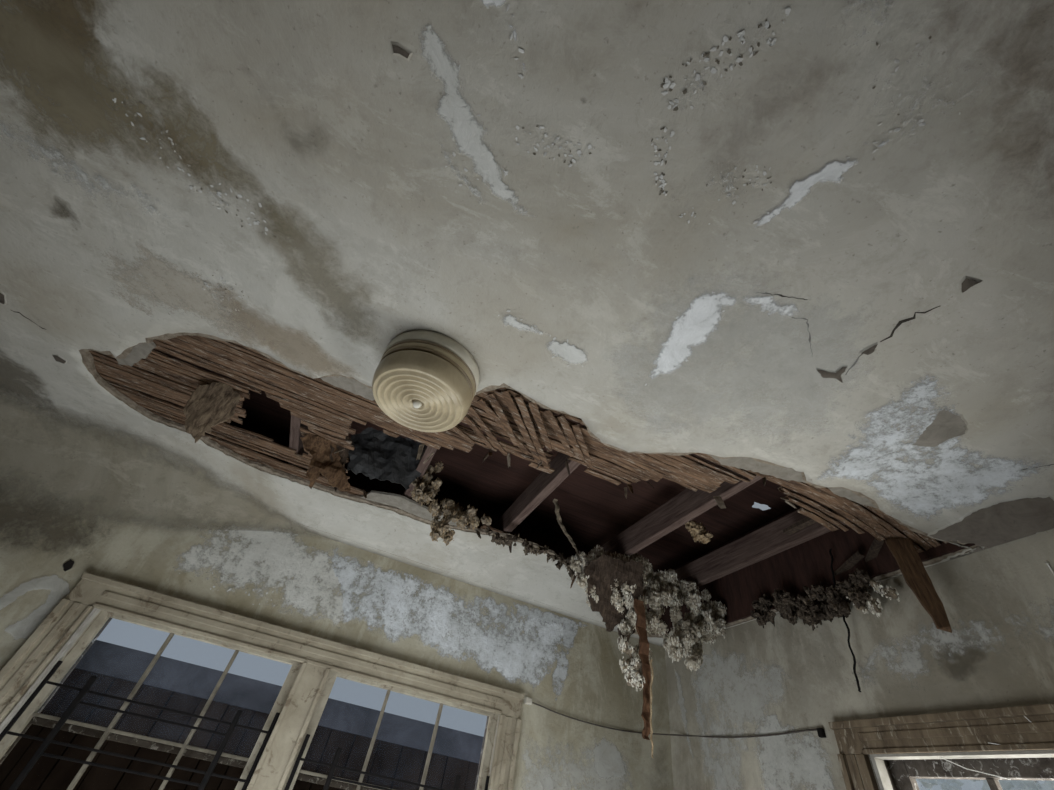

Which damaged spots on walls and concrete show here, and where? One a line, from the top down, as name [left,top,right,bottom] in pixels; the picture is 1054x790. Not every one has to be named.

damp [0,0,257,189]
peeling [390,25,526,213]
peeling [753,157,854,226]
crack [959,276,983,293]
peeling [498,310,588,367]
peeling [645,292,797,386]
crack [757,292,940,383]
damp [0,483,94,551]
peeling [818,377,1054,563]
peeling [175,526,587,700]